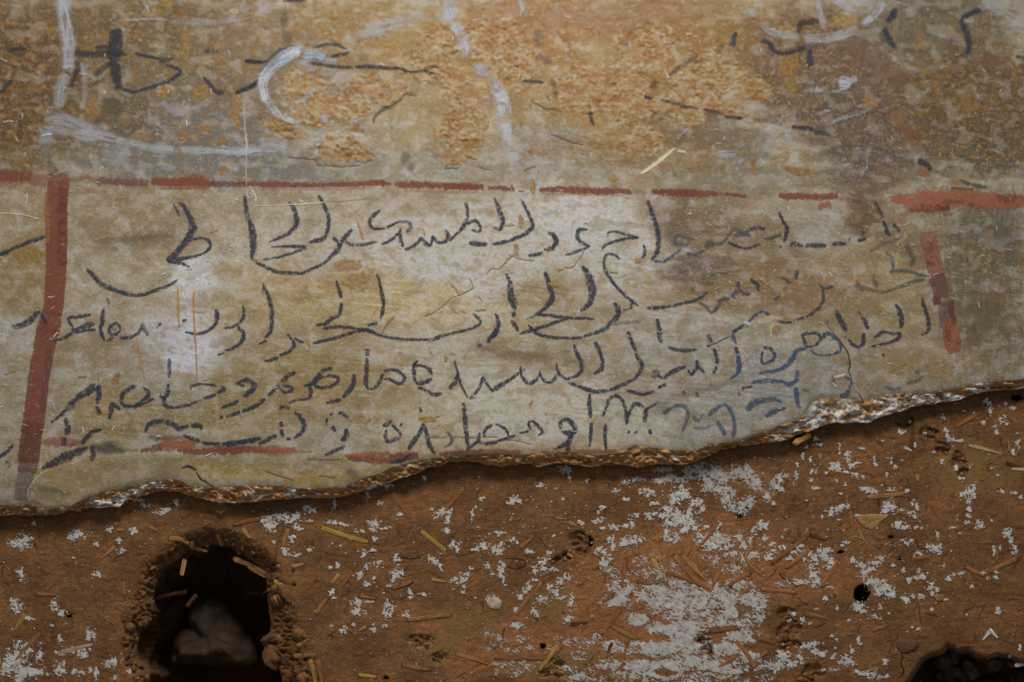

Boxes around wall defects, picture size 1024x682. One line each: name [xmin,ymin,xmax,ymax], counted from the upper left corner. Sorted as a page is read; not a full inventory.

spalling [230,6,542,166]
spalling [544,25,801,158]
peeling [784,166,818,176]
peeling [334,256,369,291]
spalling [0,354,1024,633]
peeling [0,596,132,682]
peeling [768,633,890,680]